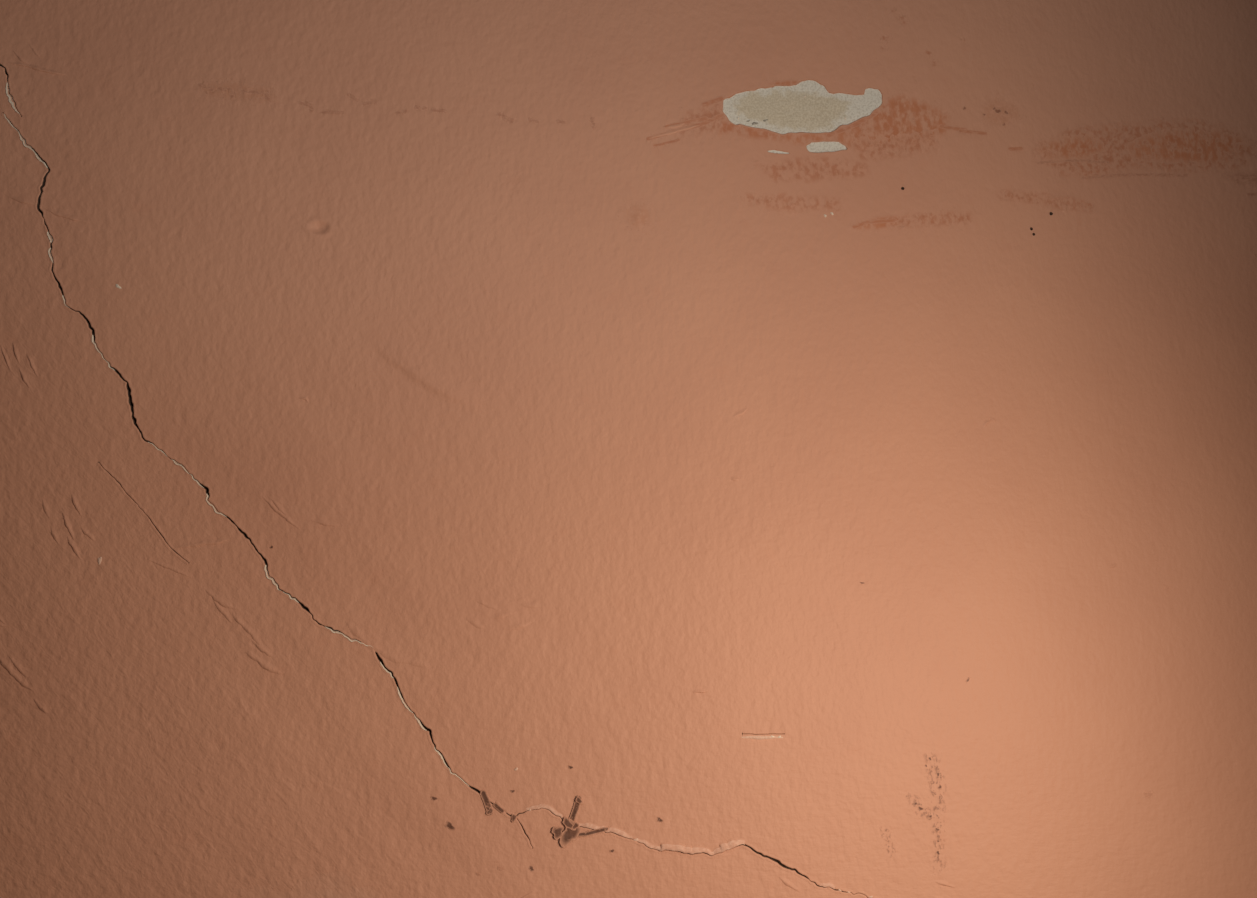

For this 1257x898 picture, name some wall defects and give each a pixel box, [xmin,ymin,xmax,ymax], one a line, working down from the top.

crack [0,44,879,898]
peeling [720,77,885,156]